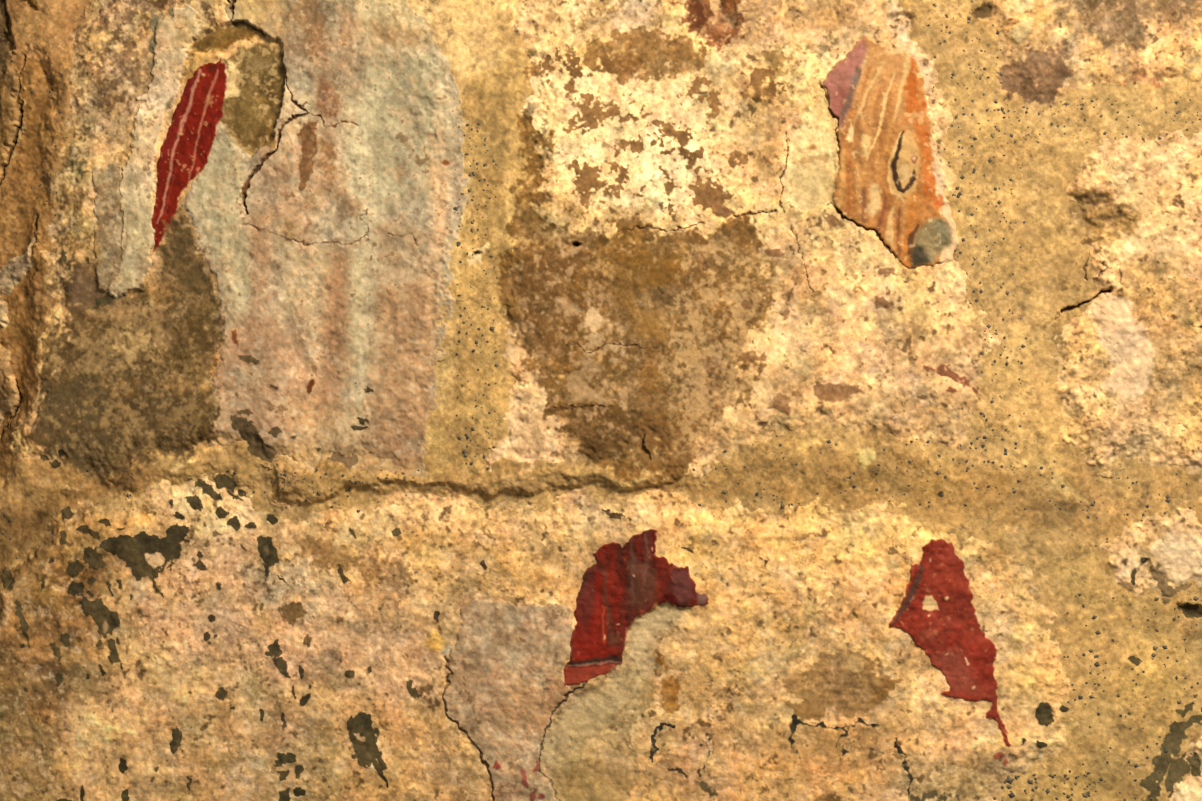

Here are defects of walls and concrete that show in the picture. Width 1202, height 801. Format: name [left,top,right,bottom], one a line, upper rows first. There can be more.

crack [228,0,236,25]
crack [0,56,53,185]
crack [241,52,420,249]
damp [491,23,790,491]
damp [25,197,299,490]
crack [0,379,23,440]
damp [349,414,369,432]
damp [40,474,417,679]
damp [215,685,236,710]
damp [404,679,422,700]
crack [442,656,495,801]
crack [538,681,588,801]